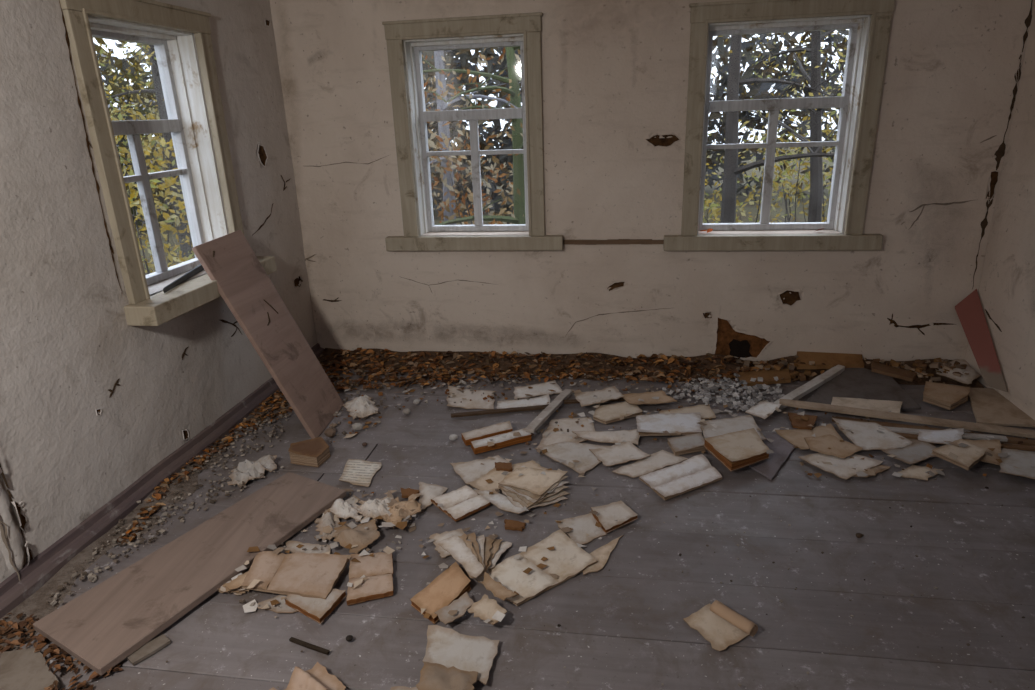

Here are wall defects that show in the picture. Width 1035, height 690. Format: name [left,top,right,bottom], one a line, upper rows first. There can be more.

spalling [644,132,681,150]
crack [908,0,1033,332]
spalling [702,311,774,361]
crack [0,465,28,581]